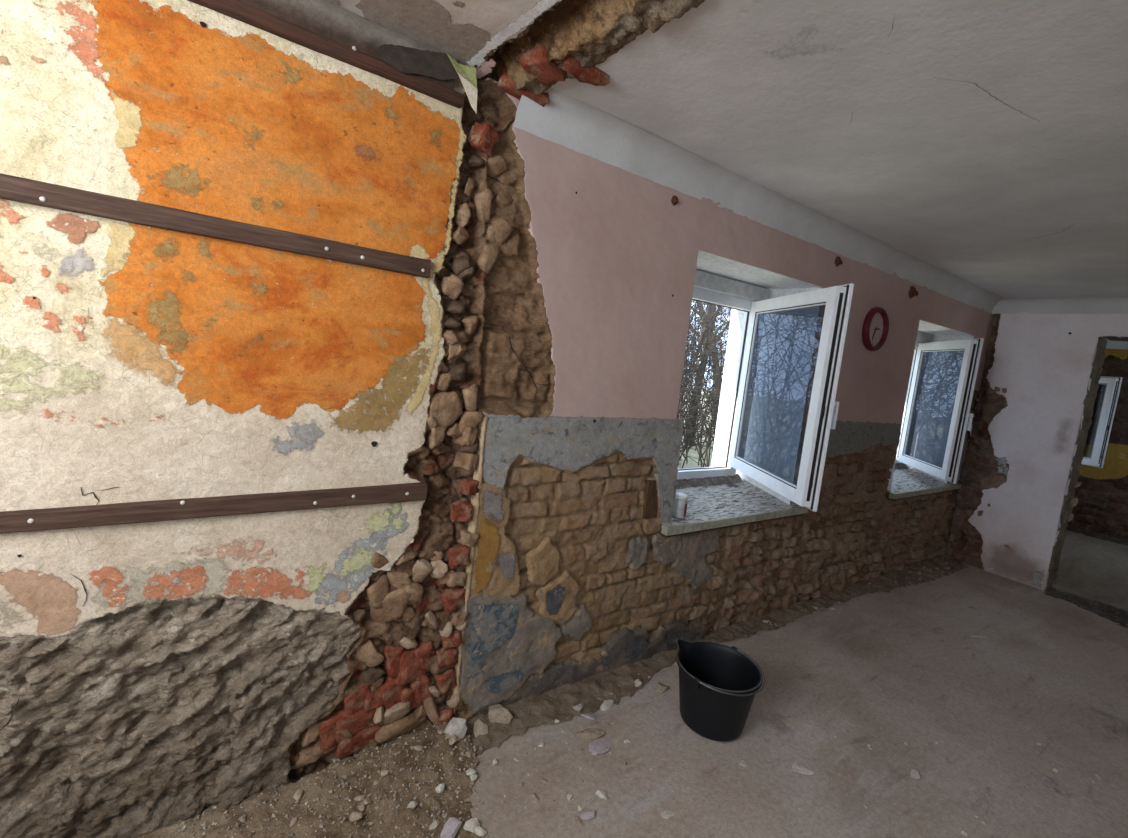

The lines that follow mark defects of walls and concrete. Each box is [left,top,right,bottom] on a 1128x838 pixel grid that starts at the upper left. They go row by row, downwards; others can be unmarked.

peeling [0,0,561,433]
spalling [0,502,409,838]
spalling [444,700,513,741]
flaking render [477,120,1009,671]
flaking render [1068,474,1128,540]
flaking render [1085,355,1128,446]